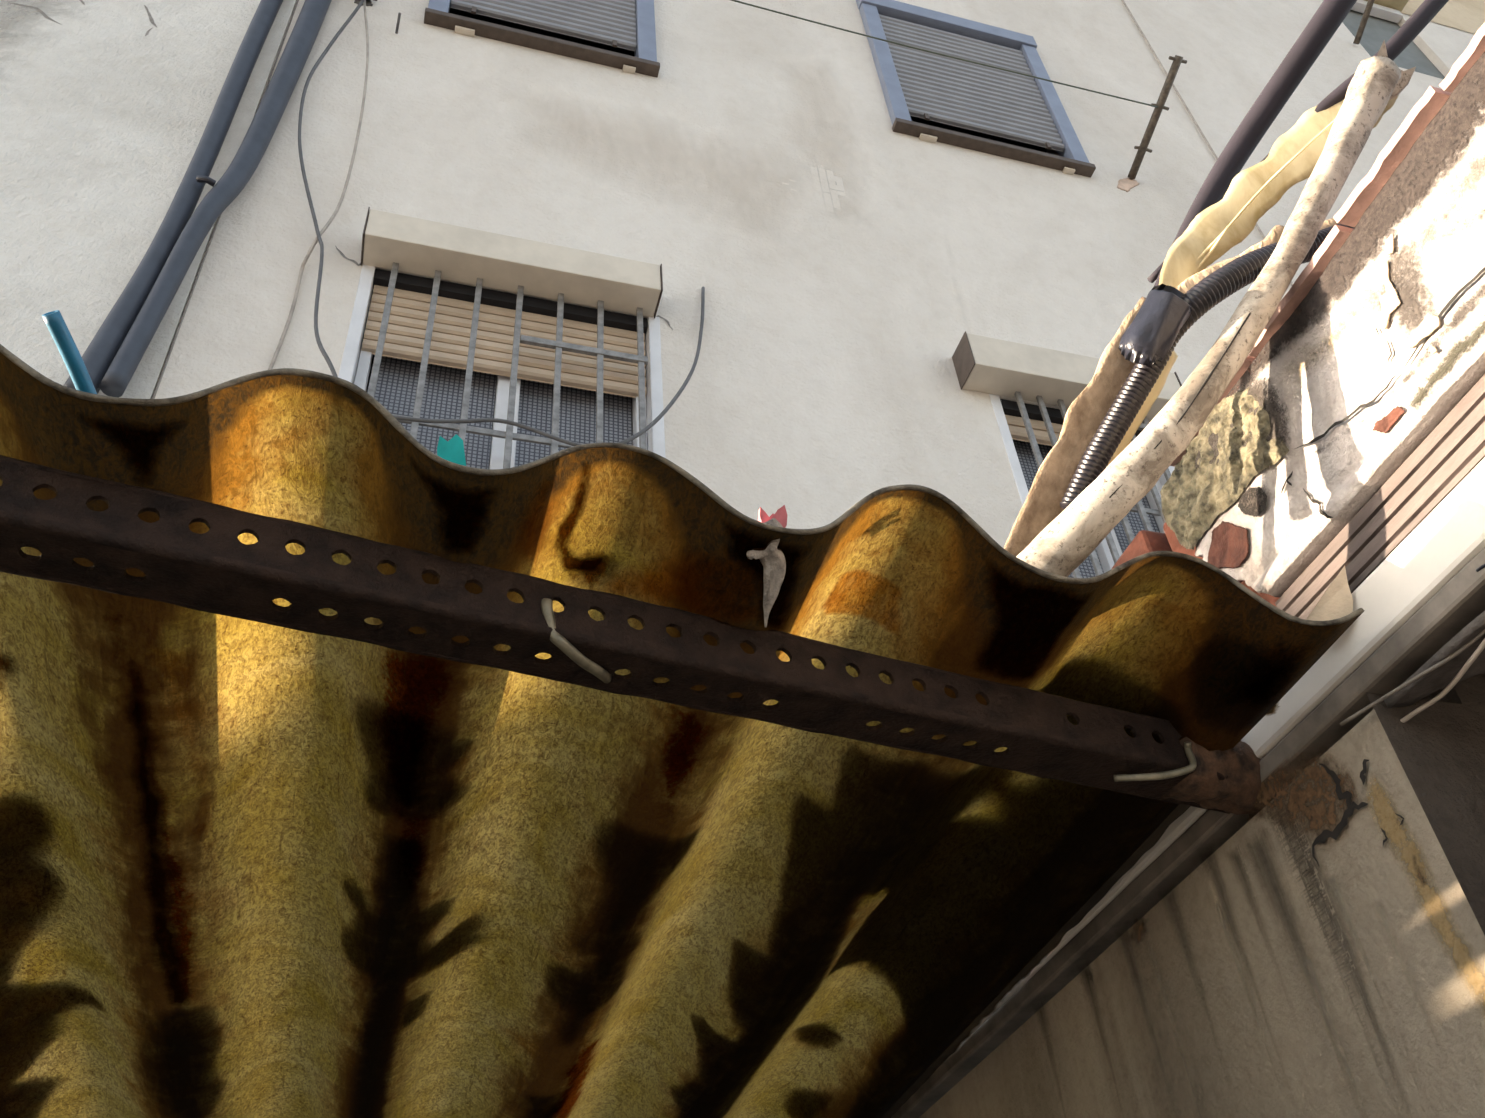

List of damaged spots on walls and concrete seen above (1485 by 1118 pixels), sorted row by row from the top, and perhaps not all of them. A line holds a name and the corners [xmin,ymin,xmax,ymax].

water stain [1225,51,1485,398]
peeling [1379,234,1401,329]
peeling [1407,314,1441,355]
crack [1280,267,1485,518]
flaking render [1373,406,1405,434]
flaking render [1208,487,1267,569]
corrosion [380,652,453,889]
crack [1312,759,1404,867]